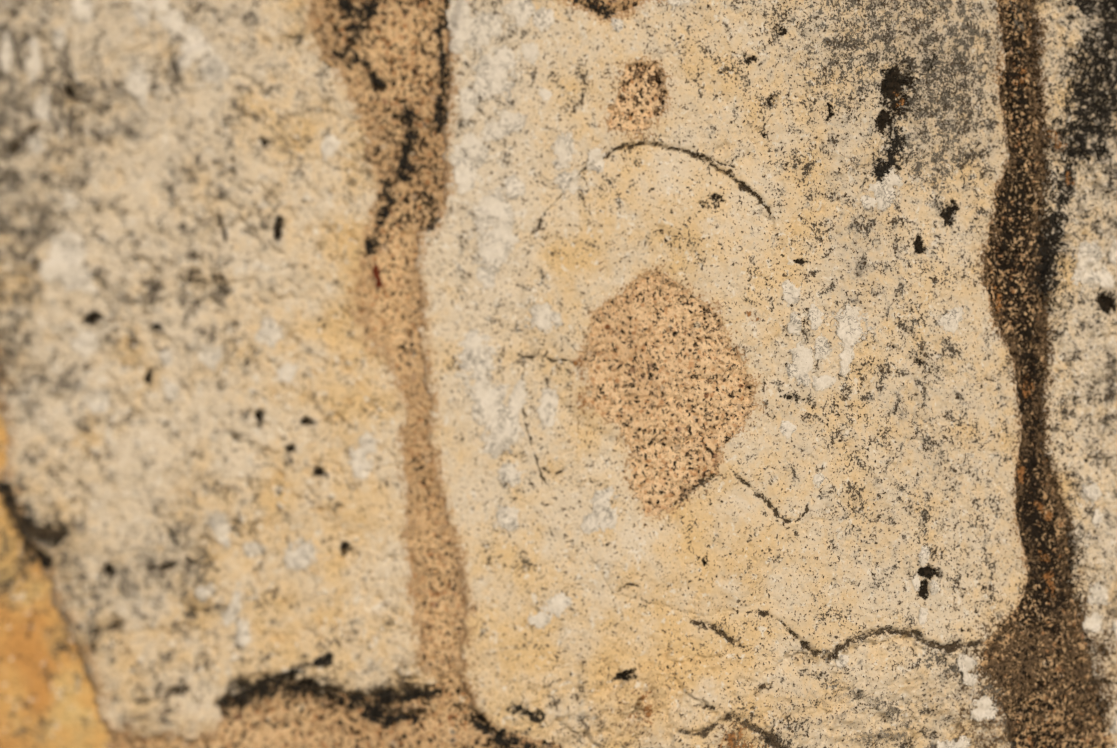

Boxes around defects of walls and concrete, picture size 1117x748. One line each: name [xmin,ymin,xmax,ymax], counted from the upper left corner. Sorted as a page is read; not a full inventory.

spalling [607,60,669,135]
crack [531,141,771,234]
spalling [578,271,756,516]
crack [690,620,745,648]
crack [746,610,1005,675]